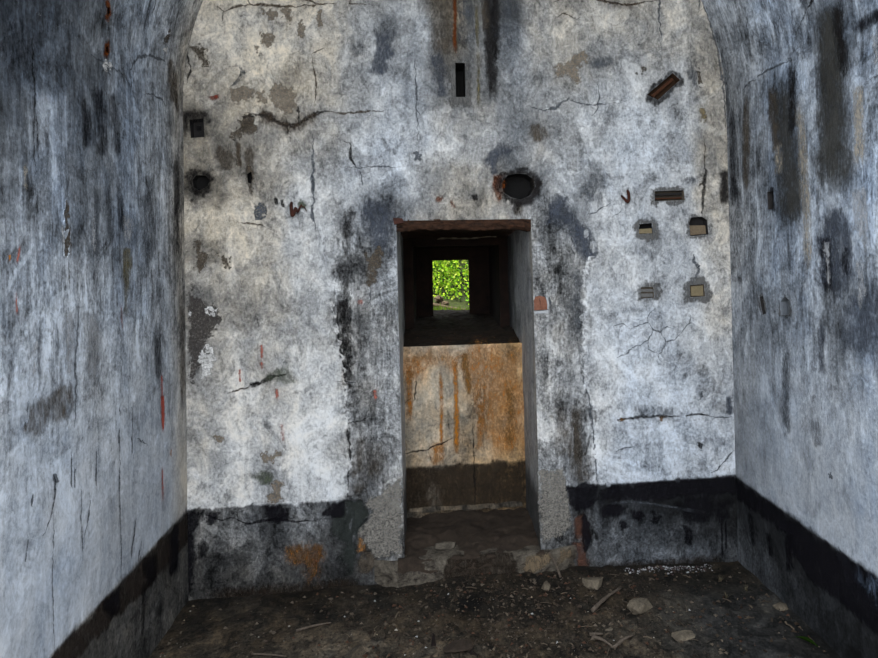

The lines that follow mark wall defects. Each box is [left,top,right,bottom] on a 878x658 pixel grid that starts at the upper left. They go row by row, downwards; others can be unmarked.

crack [218,0,366,21]
crack [598,0,662,47]
crack [242,48,382,229]
hole [497,168,541,210]
water stain [334,203,394,377]
crack [614,311,691,360]
crack [229,369,294,393]
corrosion [453,348,524,448]
crack [617,409,732,421]
peeling [565,256,878,634]
peeling [52,288,352,658]